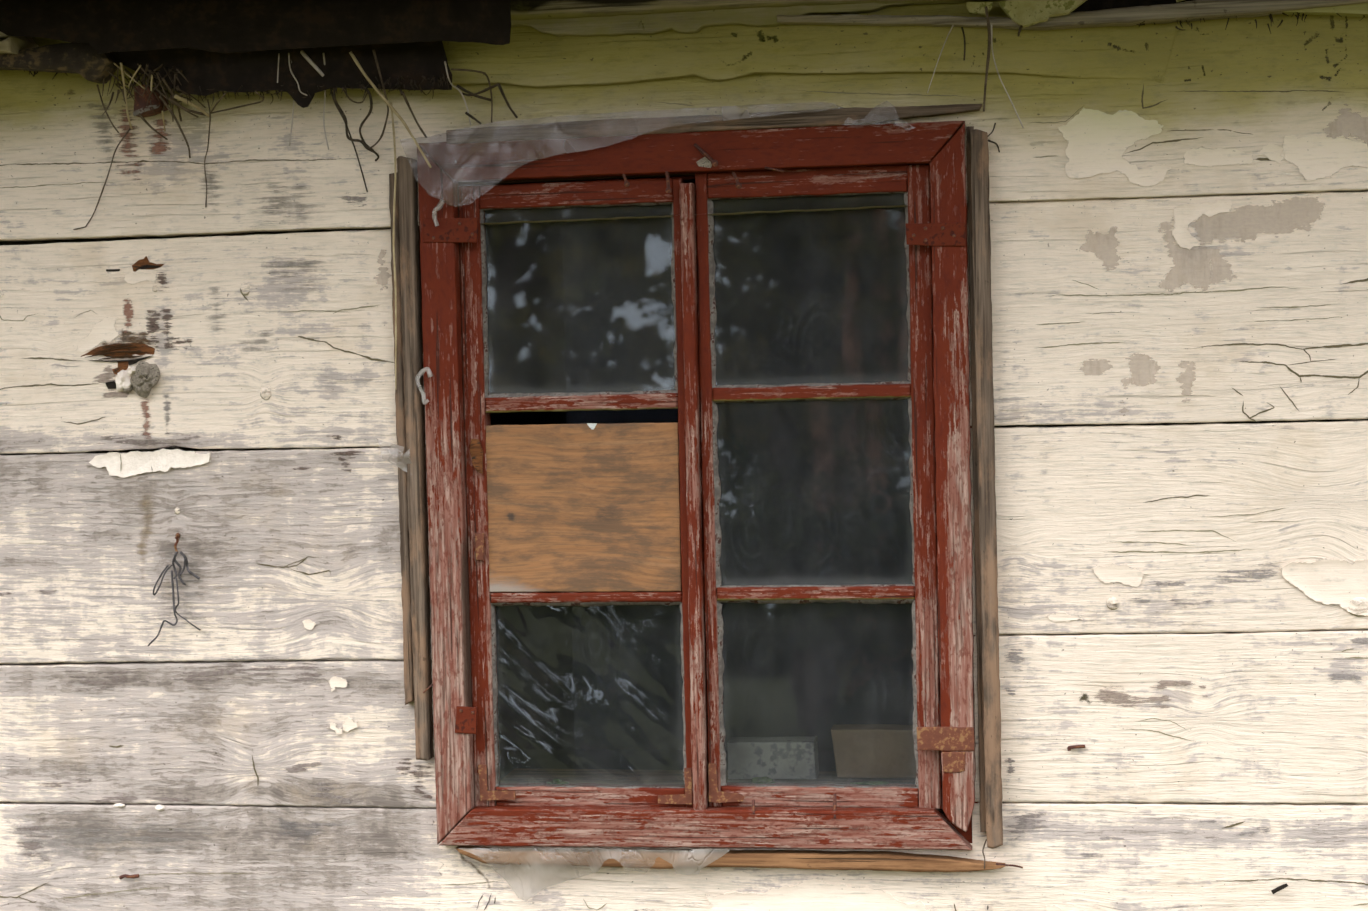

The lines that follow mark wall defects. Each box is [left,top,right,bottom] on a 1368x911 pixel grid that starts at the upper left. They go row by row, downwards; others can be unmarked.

peeling [1058,104,1368,292]
rust [123,300,134,333]
crack [1037,278,1368,422]
rust [141,401,150,439]
peeling [1281,558,1368,616]
peeling [704,877,930,911]